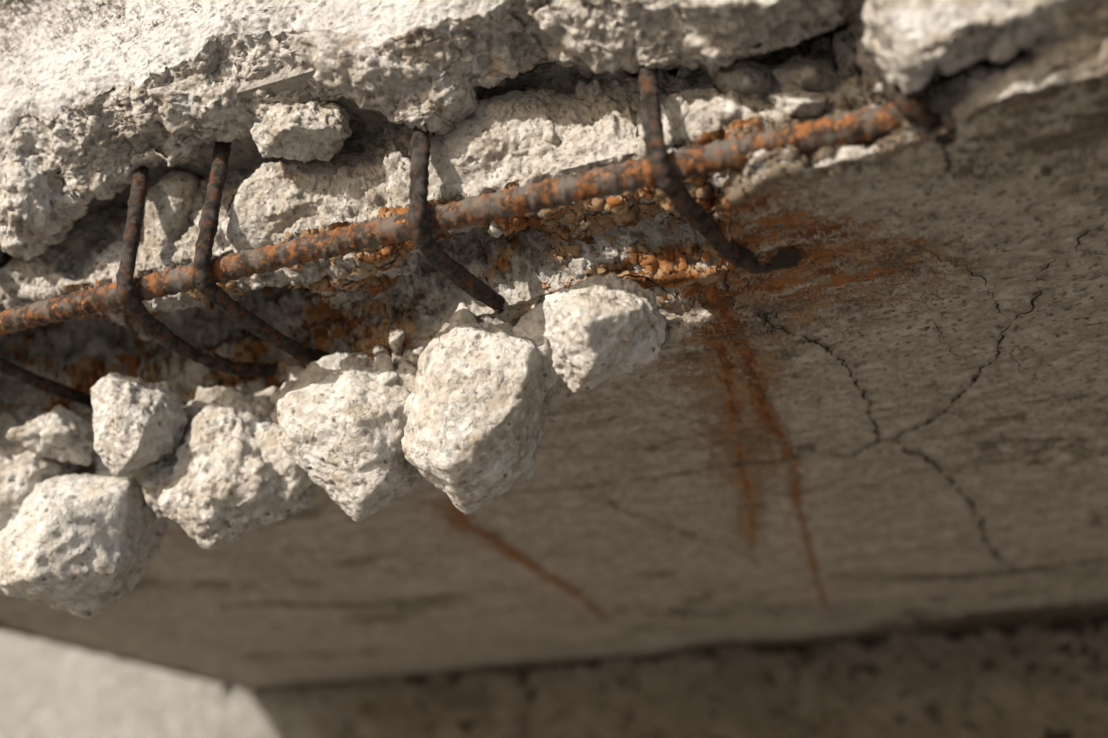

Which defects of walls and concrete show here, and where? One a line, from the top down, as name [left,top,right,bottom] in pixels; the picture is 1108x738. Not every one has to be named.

corrosion [5,306,173,416]
spalling [0,306,249,423]
spalling [0,28,353,303]
spalling [142,292,255,358]
corrosion [262,239,427,361]
corrosion [285,204,409,241]
spalling [228,184,735,357]
spalling [271,0,1070,244]
corrosion [426,162,987,622]
corrosion [681,115,763,149]
crack [514,221,1106,593]
crack [944,151,952,174]